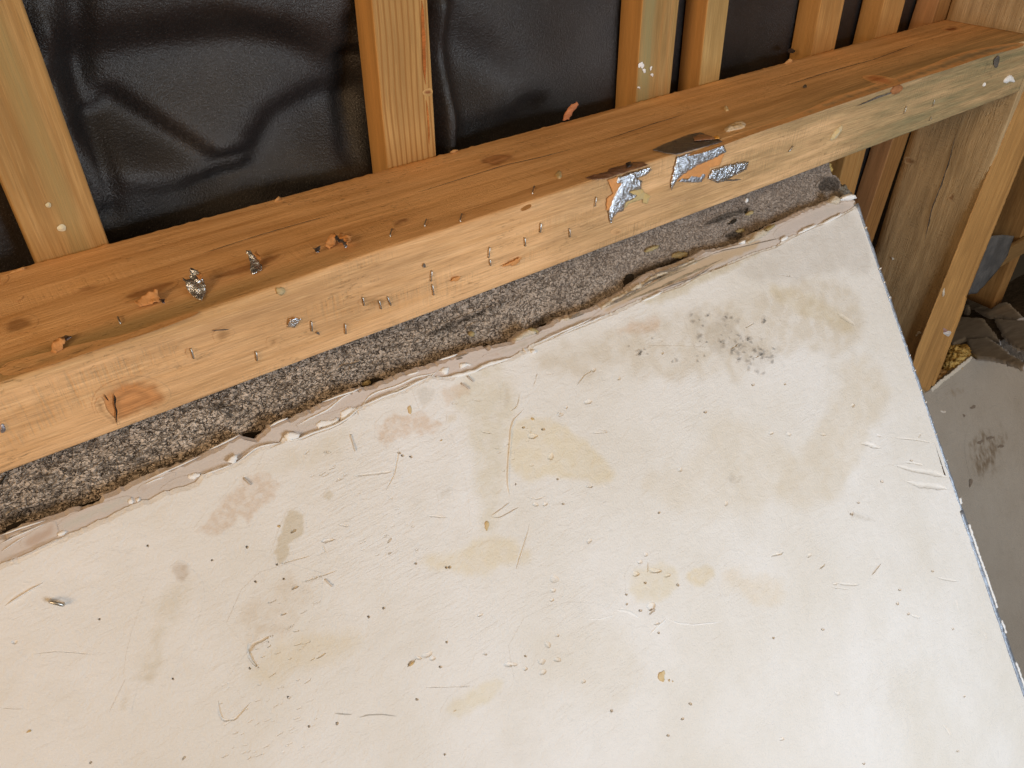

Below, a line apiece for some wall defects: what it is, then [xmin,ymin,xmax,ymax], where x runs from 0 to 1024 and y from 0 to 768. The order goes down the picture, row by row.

flaking render [738,224,775,245]
flaking render [781,194,857,241]
flaking render [599,259,697,310]
flaking render [512,313,591,343]
flaking render [146,354,513,484]
leakage [413,204,896,583]
leakage [965,417,1011,485]
flaking render [0,520,46,543]
peeling [193,469,282,541]
leakage [227,508,379,700]
leakage [440,558,794,729]